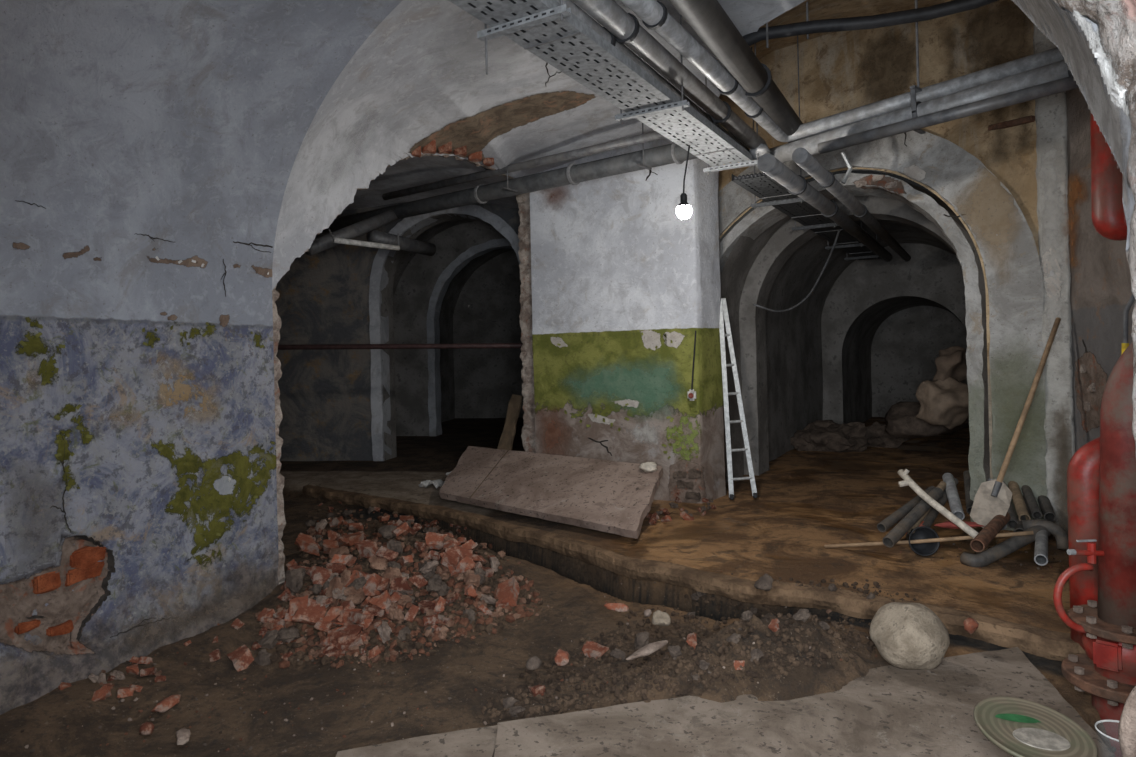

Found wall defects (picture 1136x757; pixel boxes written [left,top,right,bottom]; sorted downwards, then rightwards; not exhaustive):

flaking render [411,139,494,166]
corrosion [1068,175,1086,265]
flaking render [62,245,102,261]
flaking render [147,248,208,268]
crack [221,241,273,297]
flaking render [233,264,273,278]
peeling [550,337,568,348]
peeling [641,330,685,351]
flaking render [0,535,115,656]